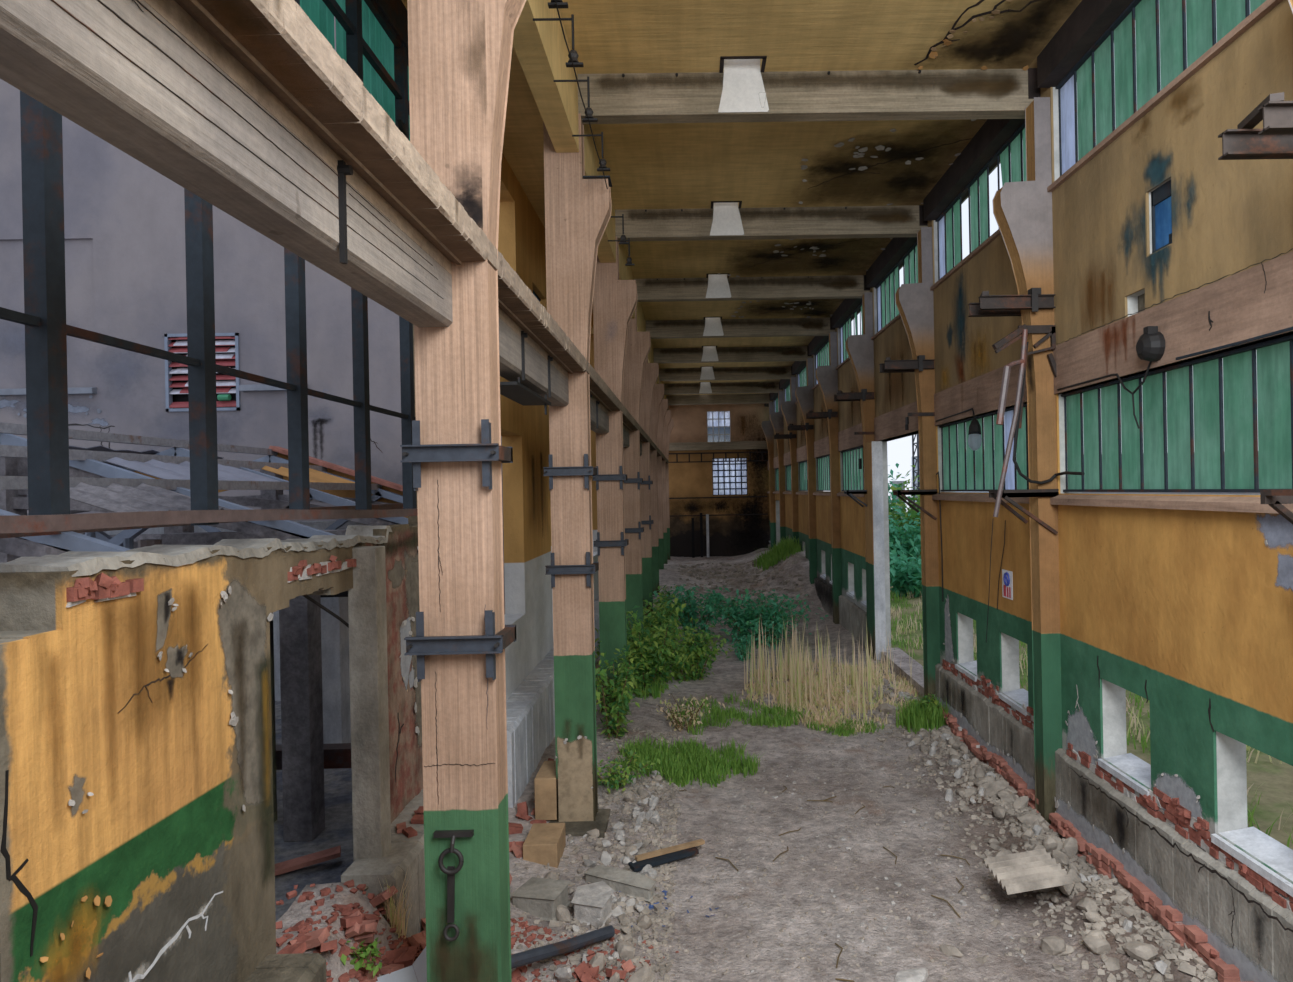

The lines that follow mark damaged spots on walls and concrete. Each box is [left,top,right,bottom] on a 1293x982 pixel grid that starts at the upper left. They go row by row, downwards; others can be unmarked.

damp [600,0,1064,112]
crack [914,0,1040,66]
damp [465,200,483,225]
damp [630,128,961,236]
damp [645,238,892,393]
peeling [1257,514,1293,591]
flaking render [66,573,193,697]
flaking render [942,596,1034,730]
crack [0,770,38,957]
flaking render [1065,708,1293,912]
crack [1069,767,1293,948]
crack [128,891,223,982]